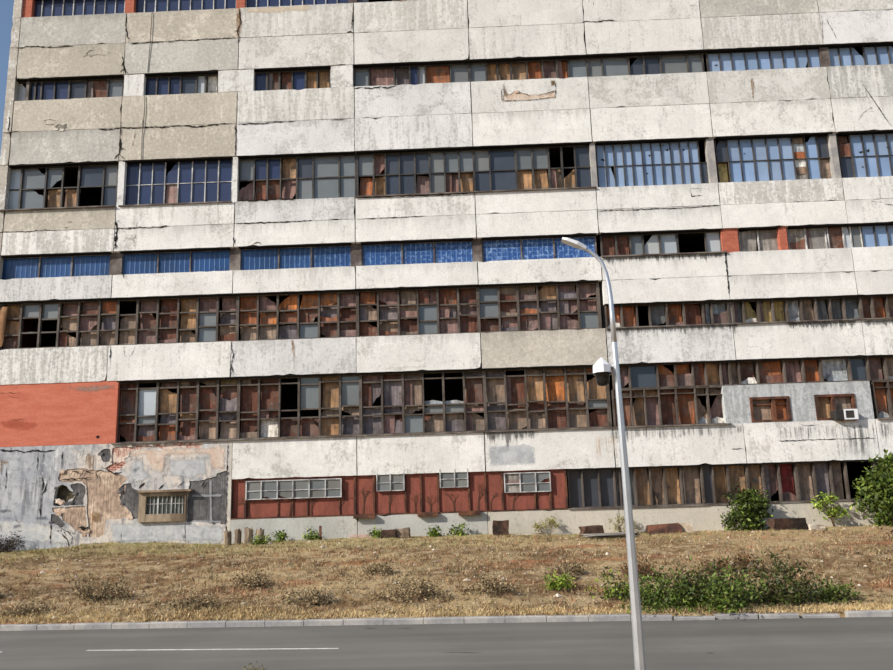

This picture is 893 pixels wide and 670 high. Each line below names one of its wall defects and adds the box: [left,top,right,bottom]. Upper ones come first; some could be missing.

flaking render [49,442,204,538]
flaking render [187,471,229,524]